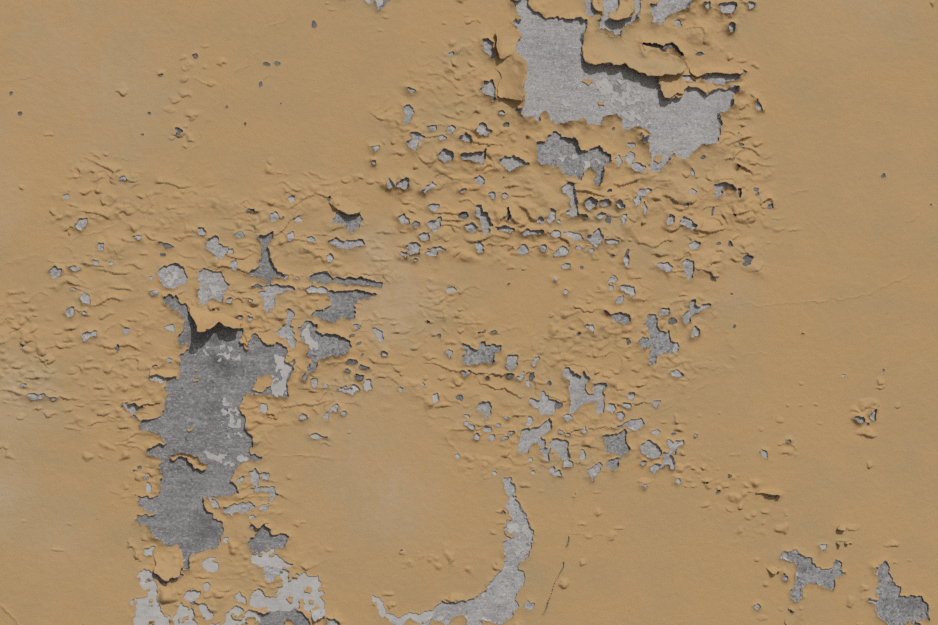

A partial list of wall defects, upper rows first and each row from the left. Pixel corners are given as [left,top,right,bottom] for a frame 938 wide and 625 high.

peeling [364,0,769,383]
peeling [116,190,393,625]
peeling [437,330,700,494]
peeling [368,471,540,625]
crack [537,466,582,625]
peeling [766,541,848,615]
peeling [864,556,934,625]